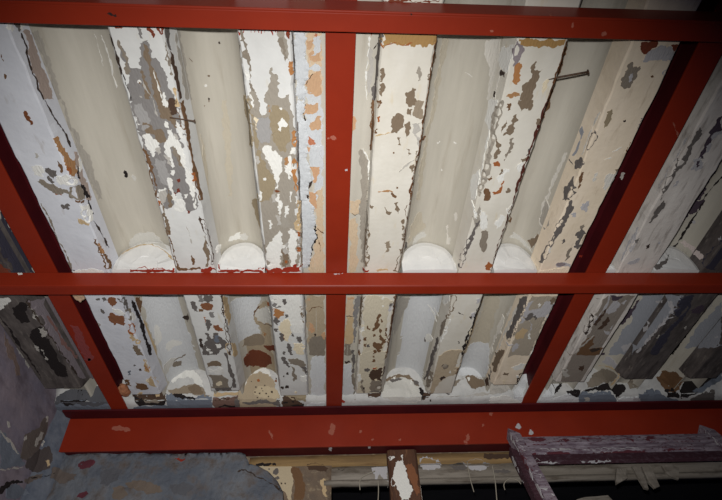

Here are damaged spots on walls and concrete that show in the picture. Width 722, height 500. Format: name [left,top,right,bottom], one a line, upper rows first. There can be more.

peeling [37,136,93,226]
peeling [117,26,214,269]
peeling [239,29,325,273]
peeling [334,33,436,275]
peeling [458,30,567,268]
spalling [527,157,589,267]
spalling [12,302,68,377]
spalling [96,295,326,409]
peeling [344,295,402,398]
spalling [410,294,527,400]
peeling [506,296,556,340]
spalling [551,295,722,402]